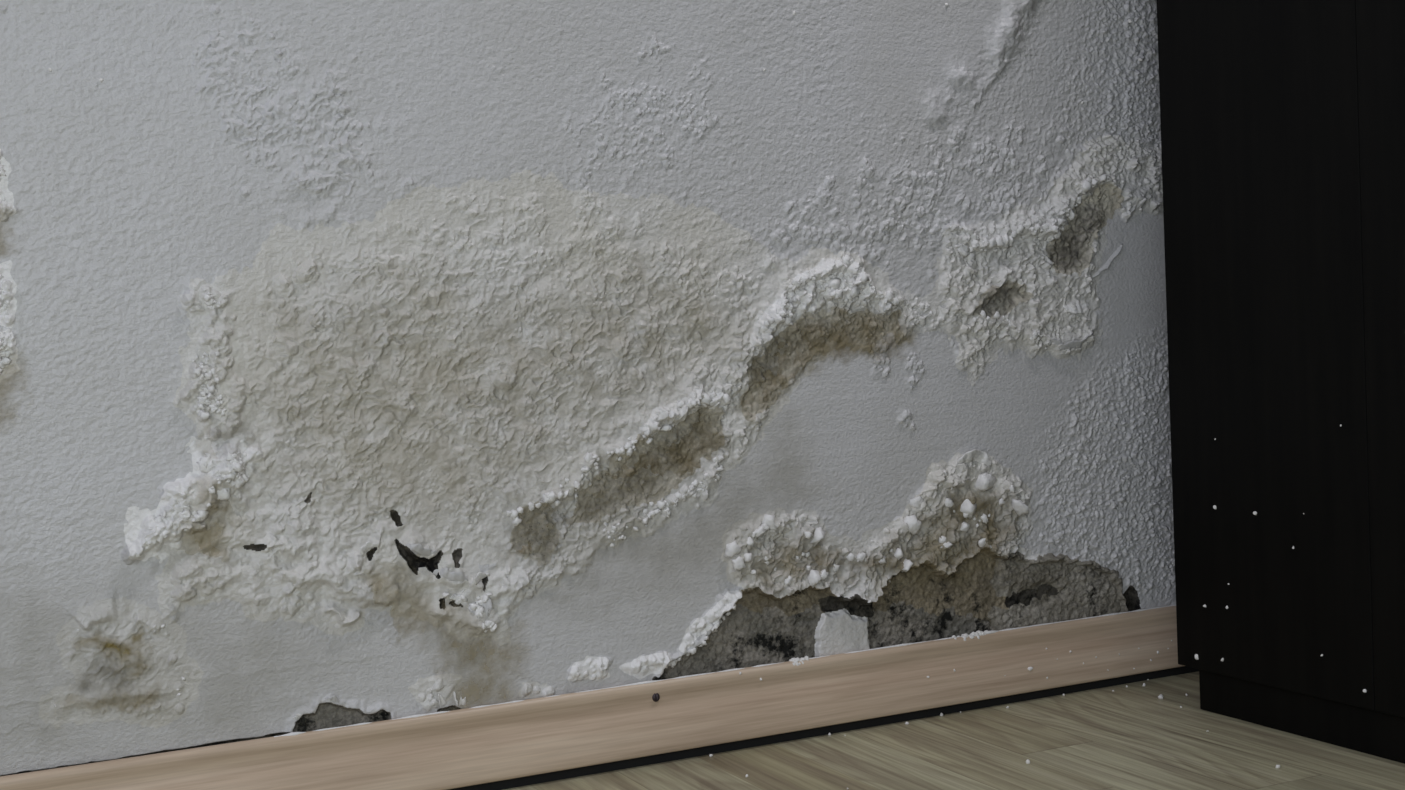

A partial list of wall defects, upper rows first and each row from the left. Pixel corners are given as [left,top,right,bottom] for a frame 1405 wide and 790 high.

peeling [489,134,1163,608]
spalling [652,550,1141,681]
spalling [292,695,391,732]